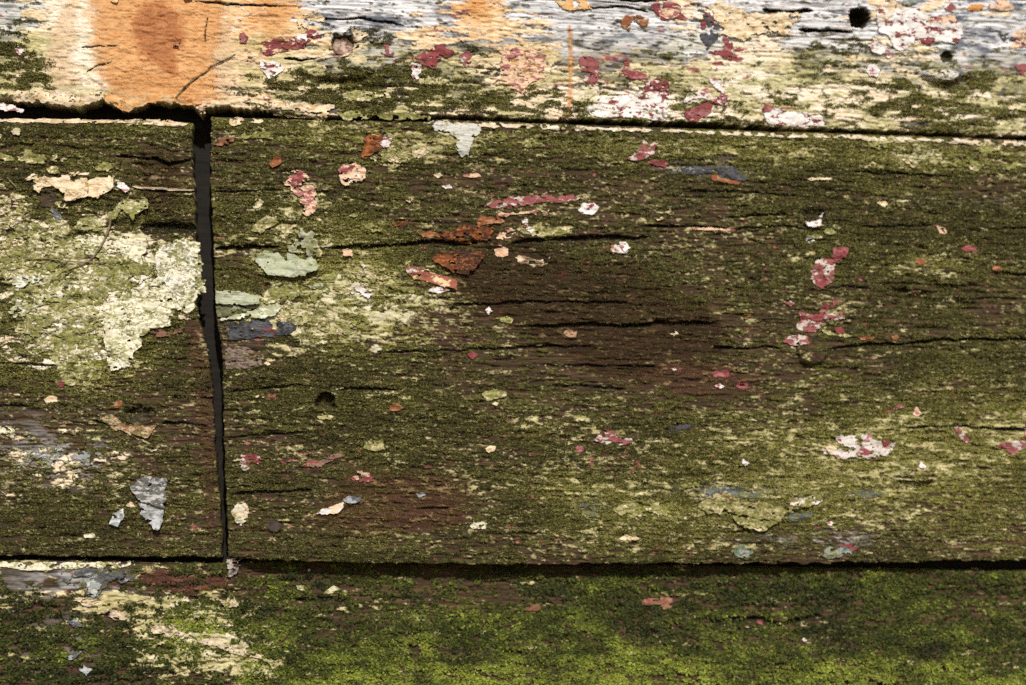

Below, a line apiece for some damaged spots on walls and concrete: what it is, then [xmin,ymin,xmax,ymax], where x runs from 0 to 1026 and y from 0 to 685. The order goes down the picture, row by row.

crack [193,1,404,41]
crack [284,55,319,63]
peeling [697,1,802,60]
peeling [0,90,207,138]
peeling [213,55,1026,186]
peeling [0,148,457,403]
crack [215,243,279,251]
peeling [476,194,599,267]
crack [323,190,806,250]
peeling [820,433,898,459]
peeling [109,476,168,530]
peeling [0,561,137,620]